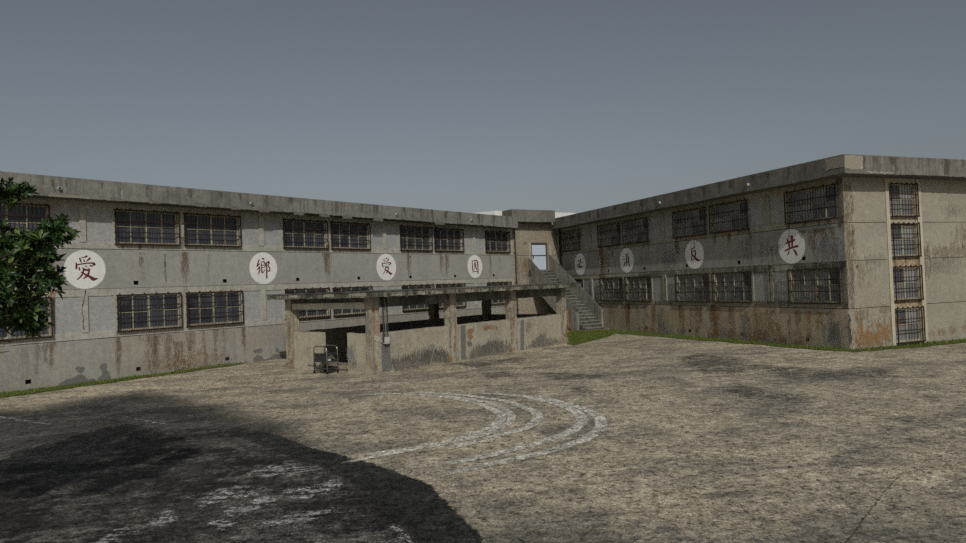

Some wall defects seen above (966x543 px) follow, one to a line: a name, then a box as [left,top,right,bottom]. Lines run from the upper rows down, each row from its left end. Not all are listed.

rust [850,317,900,349]
crack [844,471,904,543]